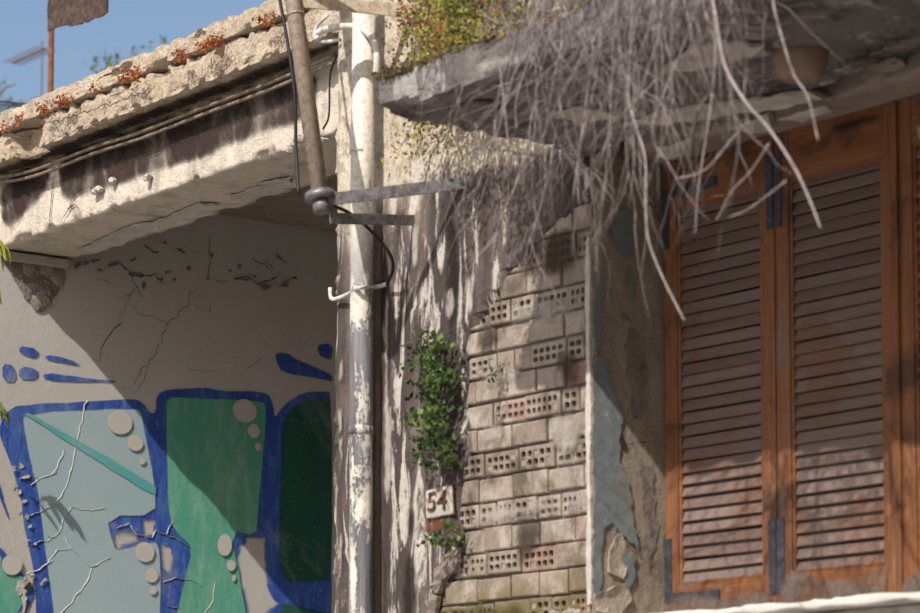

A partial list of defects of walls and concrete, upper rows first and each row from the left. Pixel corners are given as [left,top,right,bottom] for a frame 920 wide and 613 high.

leakage [1,74,300,225]
flaking render [4,202,221,312]
crack [96,237,211,394]
peeling [611,208,635,259]
crack [27,402,108,613]
crack [117,522,190,547]
peeling [591,269,659,613]